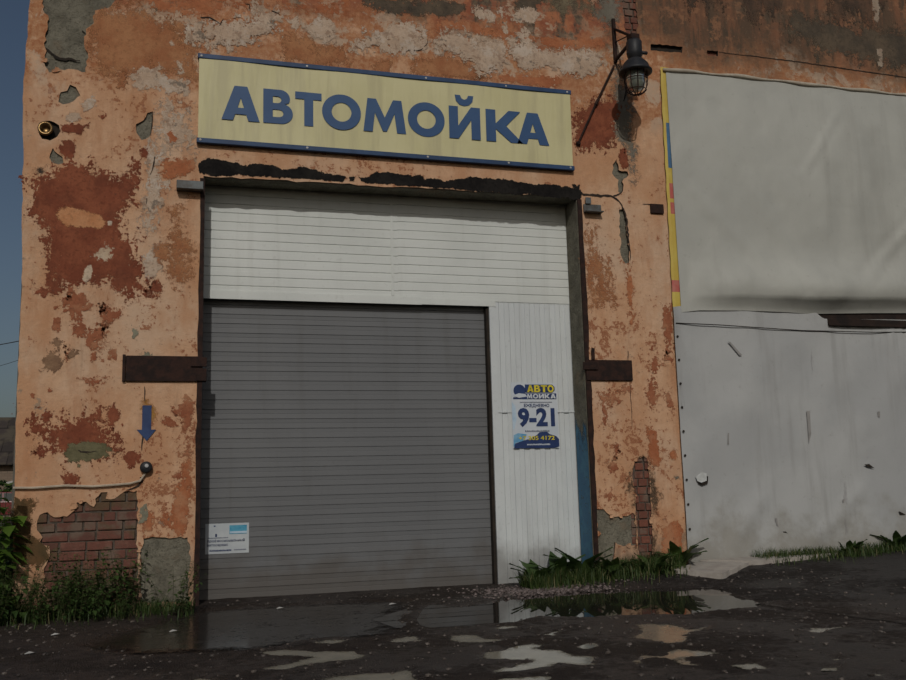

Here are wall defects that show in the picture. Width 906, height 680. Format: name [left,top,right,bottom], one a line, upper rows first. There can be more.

peeling [42,0,381,90]
damp [362,0,466,20]
peeling [410,56,562,88]
damp [513,0,621,28]
damp [741,0,906,77]
peeling [18,86,199,374]
peeling [22,388,143,488]
flaking render [596,302,684,561]
flaking render [37,394,196,605]